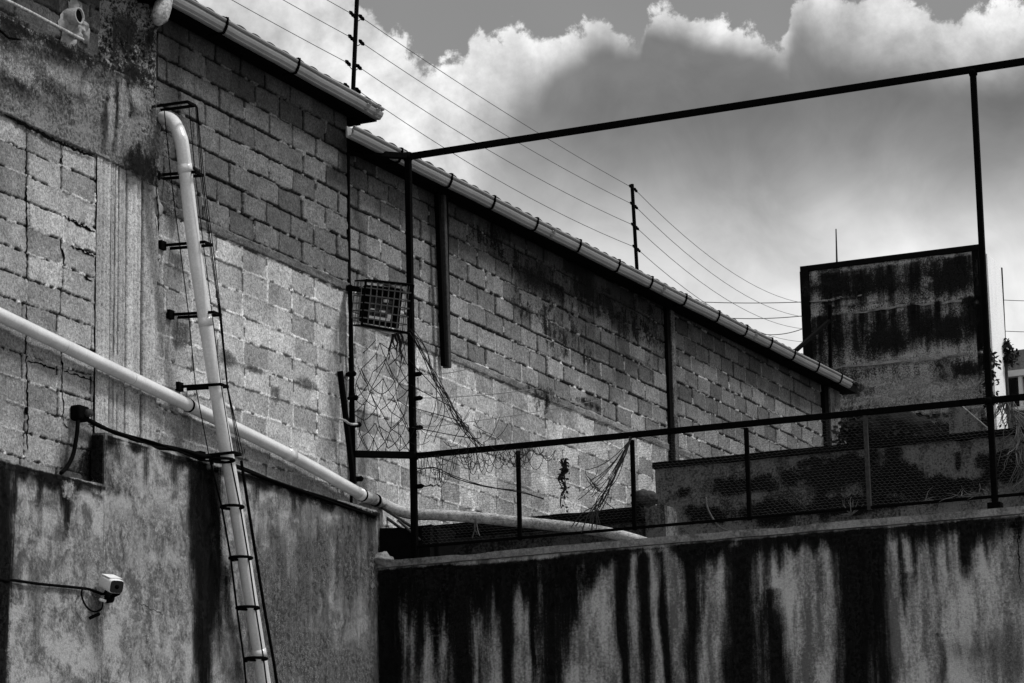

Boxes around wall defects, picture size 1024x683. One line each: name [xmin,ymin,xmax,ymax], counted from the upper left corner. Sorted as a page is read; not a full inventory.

water stain [802,254,983,383]
water stain [0,435,149,683]
water stain [161,451,257,683]
water stain [237,447,1024,683]